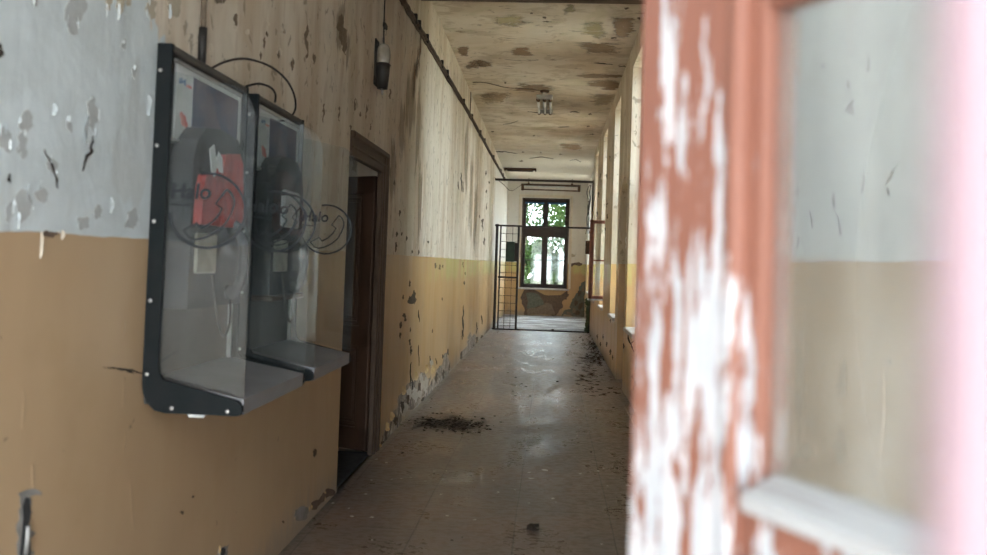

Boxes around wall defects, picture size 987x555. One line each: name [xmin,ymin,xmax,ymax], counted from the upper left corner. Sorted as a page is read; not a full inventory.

damp [458,47,491,68]
damp [512,48,532,56]
damp [582,18,635,53]
damp [516,84,551,92]
damp [578,74,622,90]
peeling [0,109,33,160]
peeling [82,96,100,171]
peeling [5,149,58,229]
spalling [520,281,585,317]
crack [103,366,142,374]
spalling [379,333,483,448]
spalling [16,488,42,555]